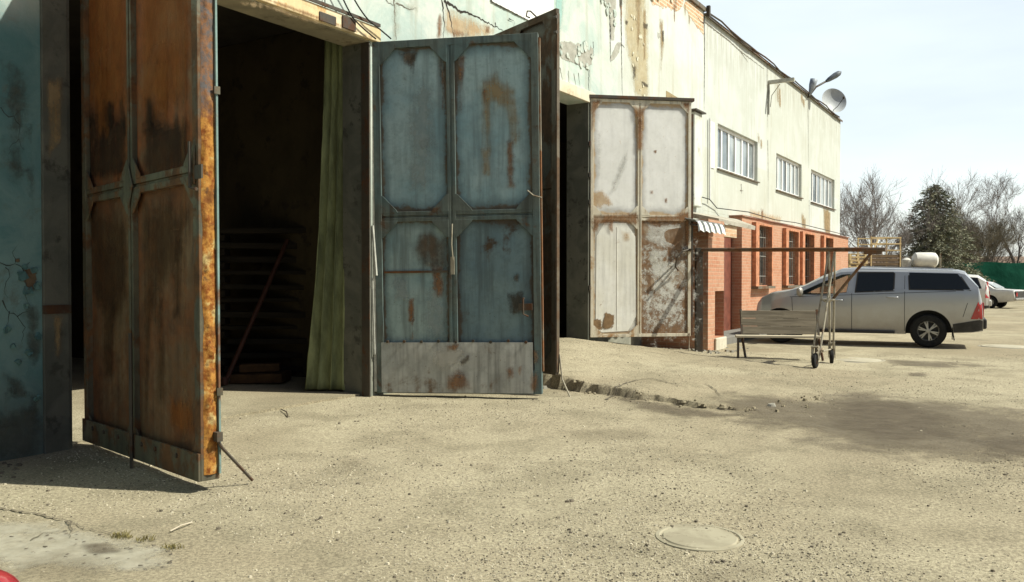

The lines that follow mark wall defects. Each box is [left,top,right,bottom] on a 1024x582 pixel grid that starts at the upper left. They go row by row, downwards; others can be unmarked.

peeling [560,40,593,70]
peeling [600,0,648,96]
corrosion [89,103,125,179]
corrosion [142,101,187,174]
corrosion [635,107,645,150]
crack [0,246,33,339]
corrosion [448,371,466,389]